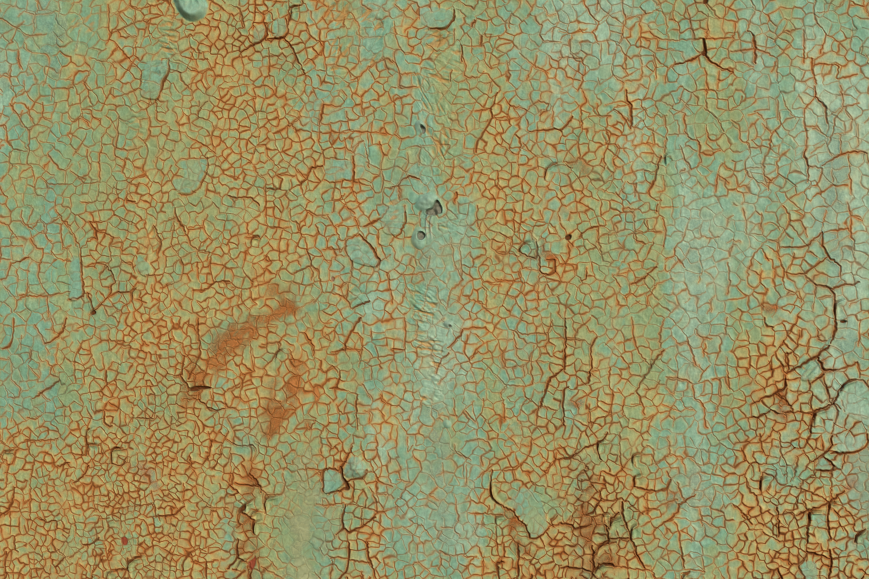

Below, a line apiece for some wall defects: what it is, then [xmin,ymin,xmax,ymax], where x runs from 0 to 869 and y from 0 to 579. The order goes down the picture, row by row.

crack [436,186,478,223]
crack [0,255,37,291]
crack [242,244,270,267]
rust [193,303,295,398]
peeling [800,359,822,381]
peeling [815,380,869,452]
peeling [815,458,832,470]
peeling [239,497,279,535]